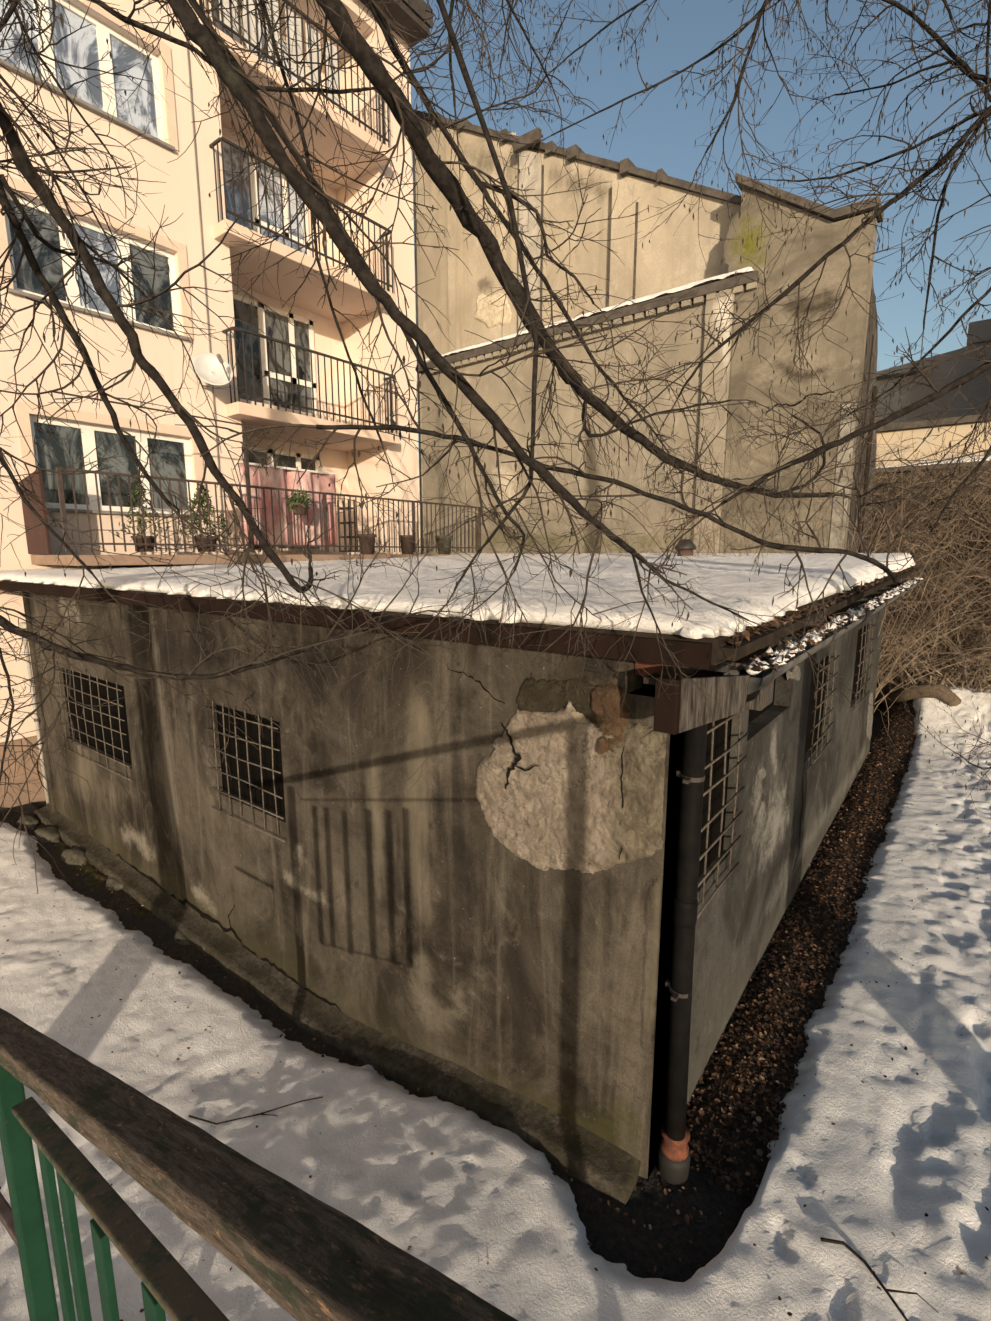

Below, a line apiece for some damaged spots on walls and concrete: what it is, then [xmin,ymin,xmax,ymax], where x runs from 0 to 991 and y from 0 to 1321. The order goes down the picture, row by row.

spalling [476,677,667,874]